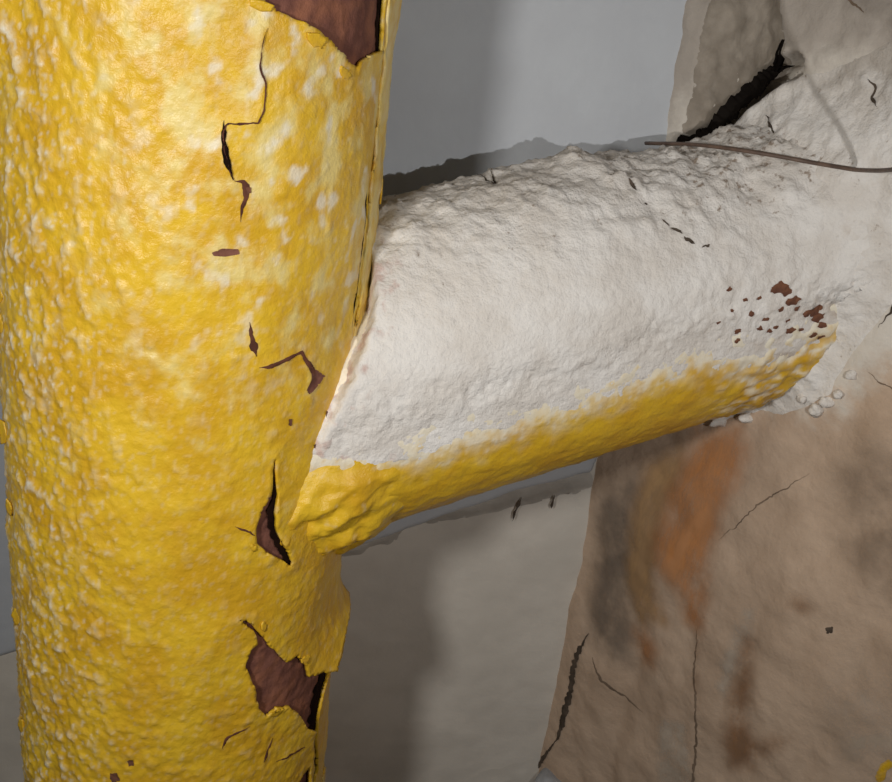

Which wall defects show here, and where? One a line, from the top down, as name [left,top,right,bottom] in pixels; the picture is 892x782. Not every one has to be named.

crack [221,28,268,221]
peeling [250,0,402,336]
crack [676,39,794,142]
peeling [212,249,239,257]
crack [354,196,367,310]
crack [249,322,325,394]
peeling [236,468,291,564]
peeling [243,621,318,729]
crack [538,634,643,768]